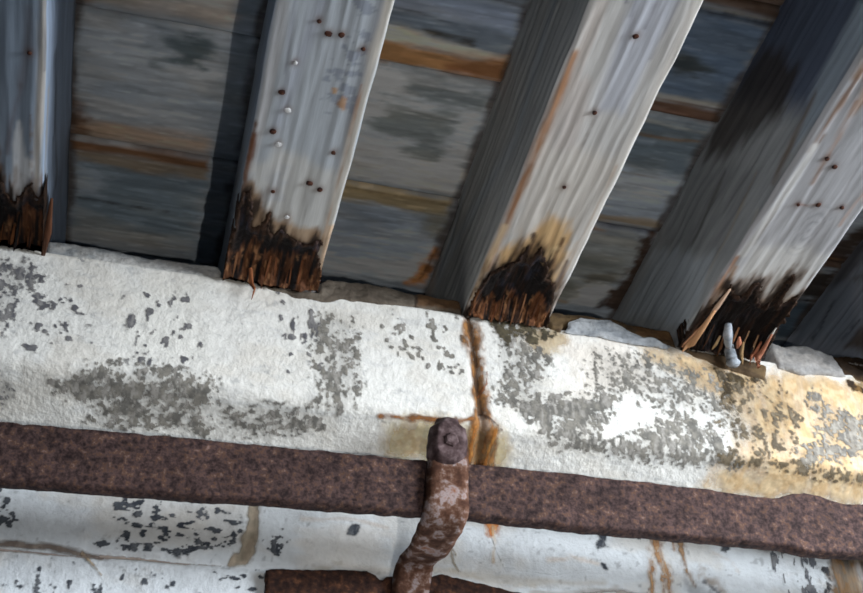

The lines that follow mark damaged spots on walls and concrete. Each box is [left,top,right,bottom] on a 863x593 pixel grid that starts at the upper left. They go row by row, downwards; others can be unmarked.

rust [455,320,504,466]
rust [378,414,438,456]
damp [647,350,863,504]
rust [648,539,689,593]
damp [821,559,863,593]